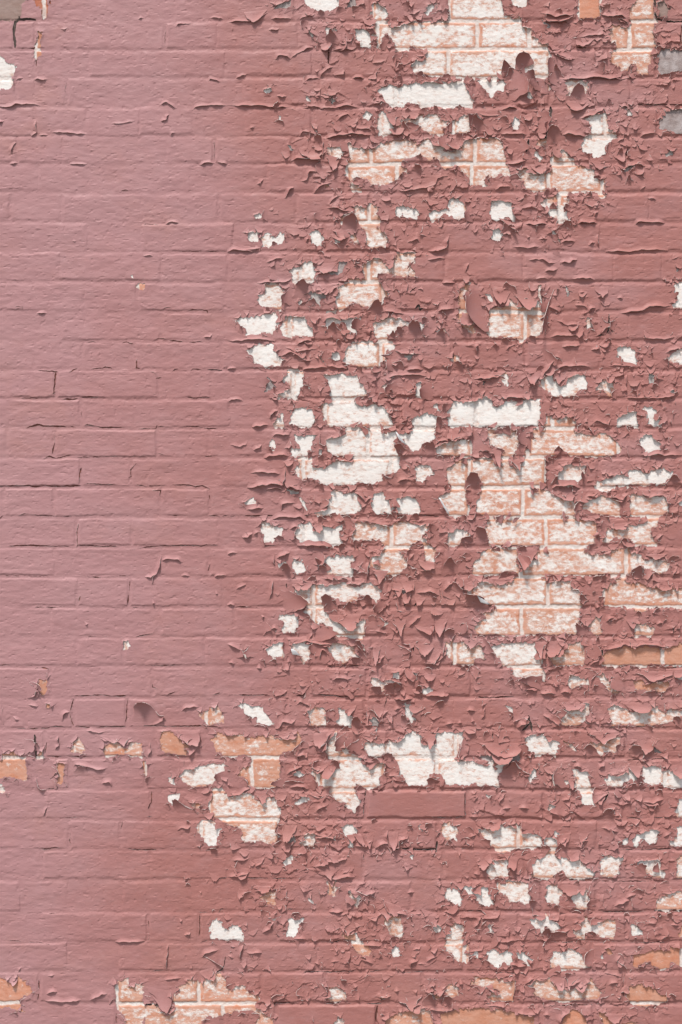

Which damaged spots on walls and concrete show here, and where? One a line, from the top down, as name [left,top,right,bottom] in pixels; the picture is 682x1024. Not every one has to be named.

peeling [0,56,17,91]
peeling [163,0,682,1024]
peeling [0,735,88,797]
peeling [109,936,360,1024]